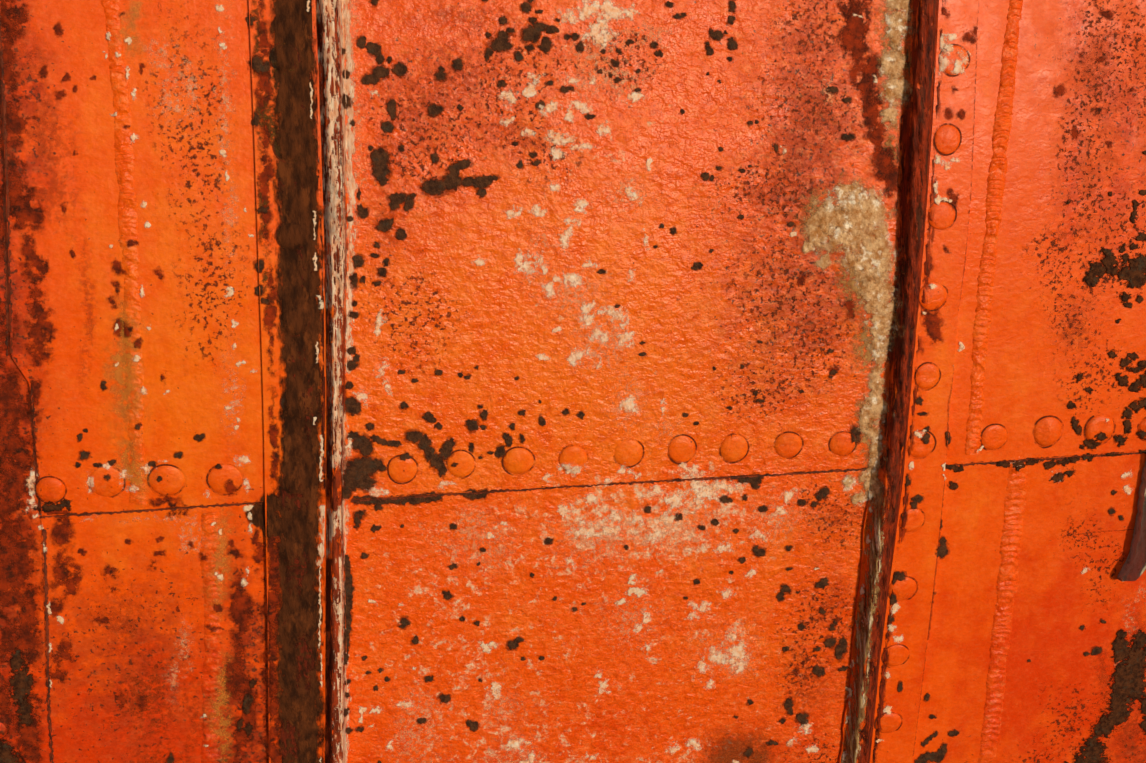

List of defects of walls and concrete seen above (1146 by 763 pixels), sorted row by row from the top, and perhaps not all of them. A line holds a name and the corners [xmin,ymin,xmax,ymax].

rust [963,27,978,44]
peeling [507,204,547,219]
peeling [514,199,647,369]
peeling [1083,190,1146,324]
rust [0,0,348,763]
peeling [466,405,526,459]
rust [351,0,965,763]
damp [802,182,903,763]
peeling [942,464,964,490]
peeling [996,349,1146,483]
peeling [1109,472,1132,521]
peeling [480,637,525,661]